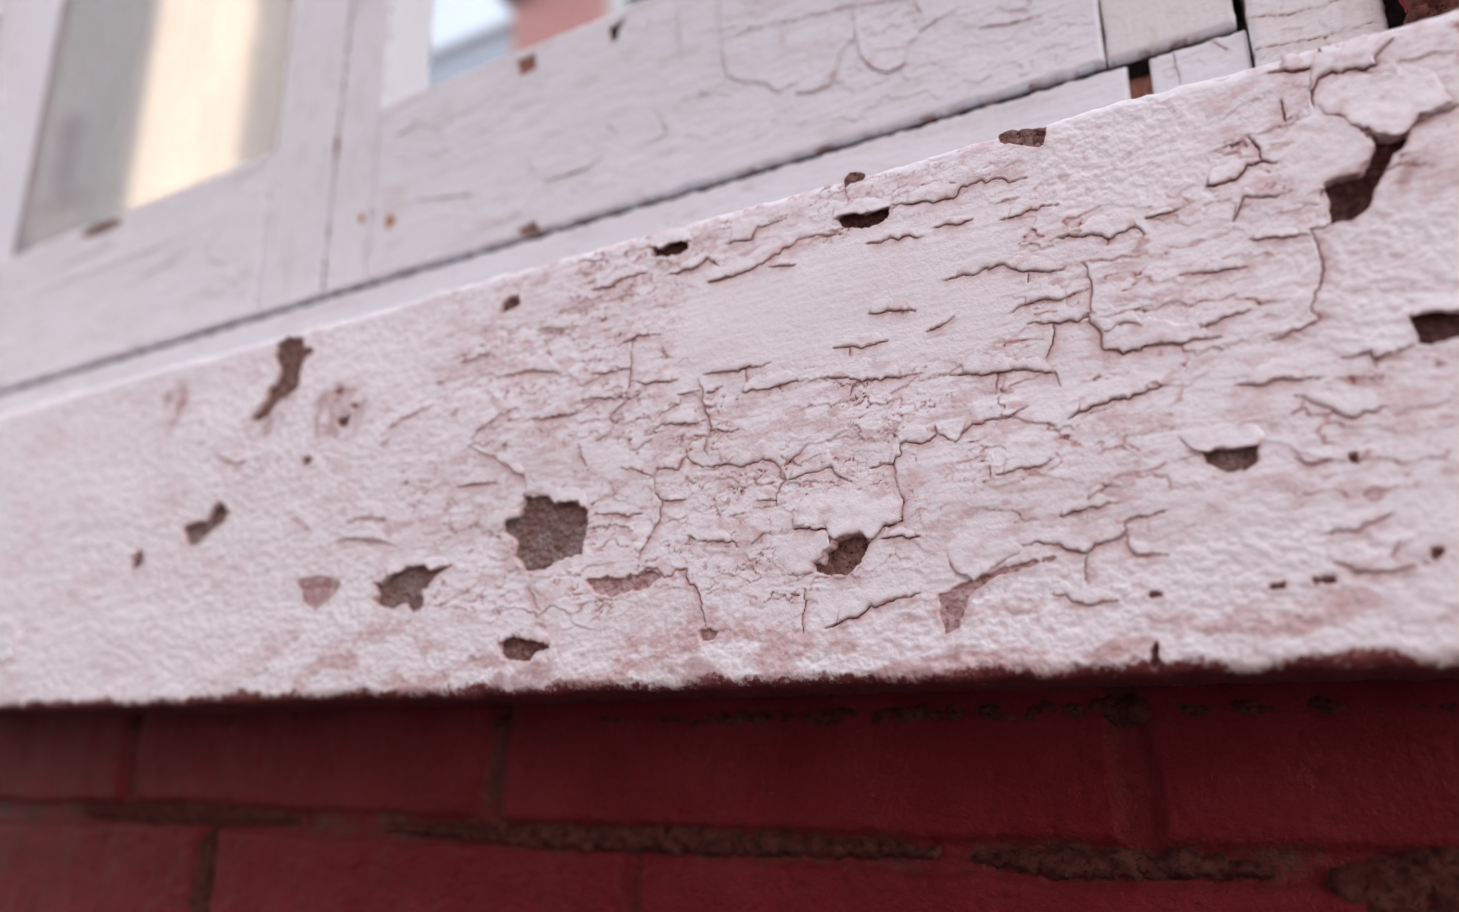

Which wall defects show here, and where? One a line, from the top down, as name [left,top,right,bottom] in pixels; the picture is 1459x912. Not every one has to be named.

crack [698,0,1040,96]
crack [1205,0,1407,122]
peeling [1275,63,1453,225]
crack [1411,100,1459,127]
peeling [832,172,892,229]
peeling [1410,292,1459,345]
peeling [253,337,313,421]
crack [381,138,1412,634]
peeling [1177,423,1265,473]
peeling [481,481,588,587]
peeling [772,484,903,577]
peeling [376,556,449,613]